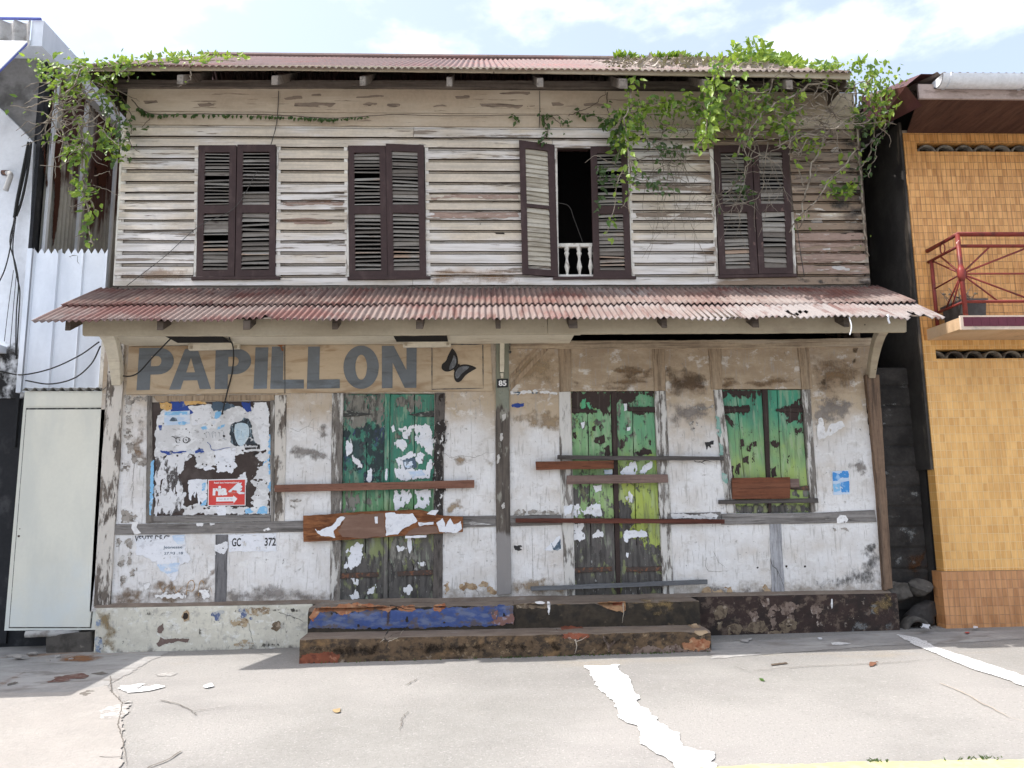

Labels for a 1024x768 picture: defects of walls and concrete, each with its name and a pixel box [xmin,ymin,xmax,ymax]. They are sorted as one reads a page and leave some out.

peeling [342,393,423,483]
peeling [432,419,449,510]
peeling [571,391,654,456]
damp [667,370,704,390]
damp [674,405,706,422]
peeling [689,389,762,455]
peeling [722,439,757,484]
damp [815,348,858,421]
peeling [308,535,548,629]
peeling [574,499,663,622]
peeling [156,623,189,647]
peeling [211,606,281,631]